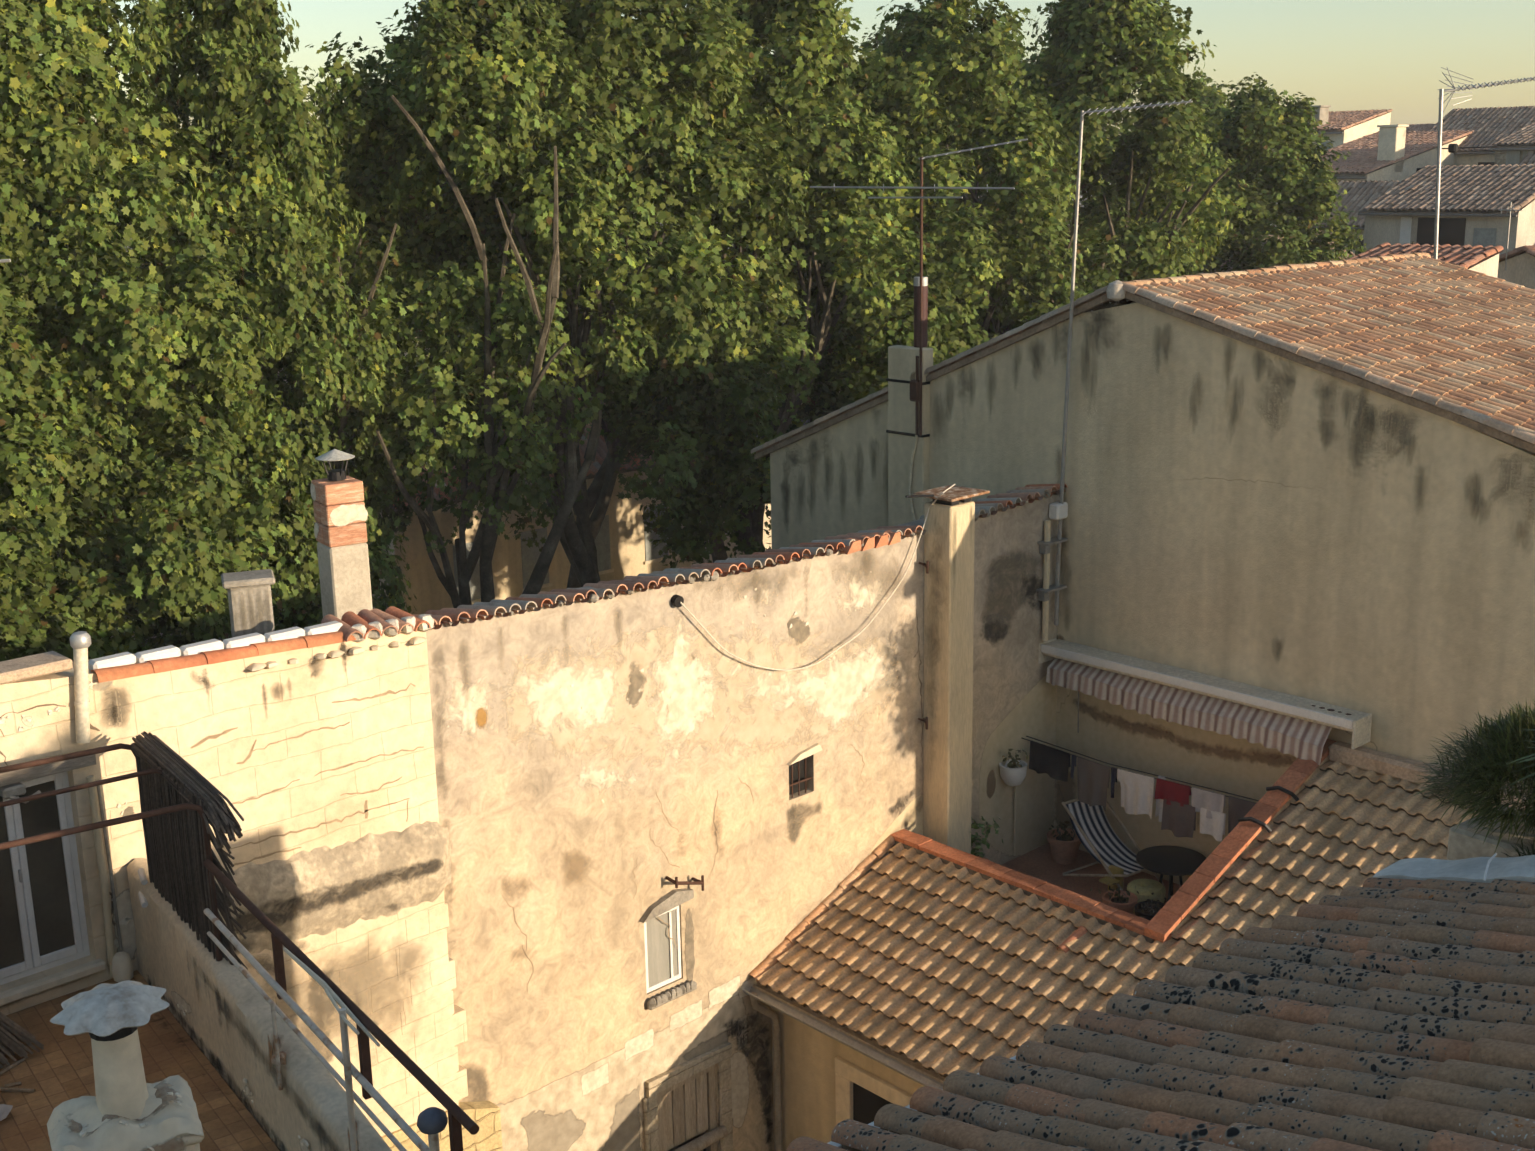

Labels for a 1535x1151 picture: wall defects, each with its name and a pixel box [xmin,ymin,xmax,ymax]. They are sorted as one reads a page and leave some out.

spalling [787,611,811,643]
water stain [984,553,1043,642]
crack [0,704,100,766]
peeling [443,617,892,803]
water stain [231,859,442,973]
peeling [68,1080,182,1137]
peeling [144,1139,184,1151]
water stain [725,1014,773,1143]